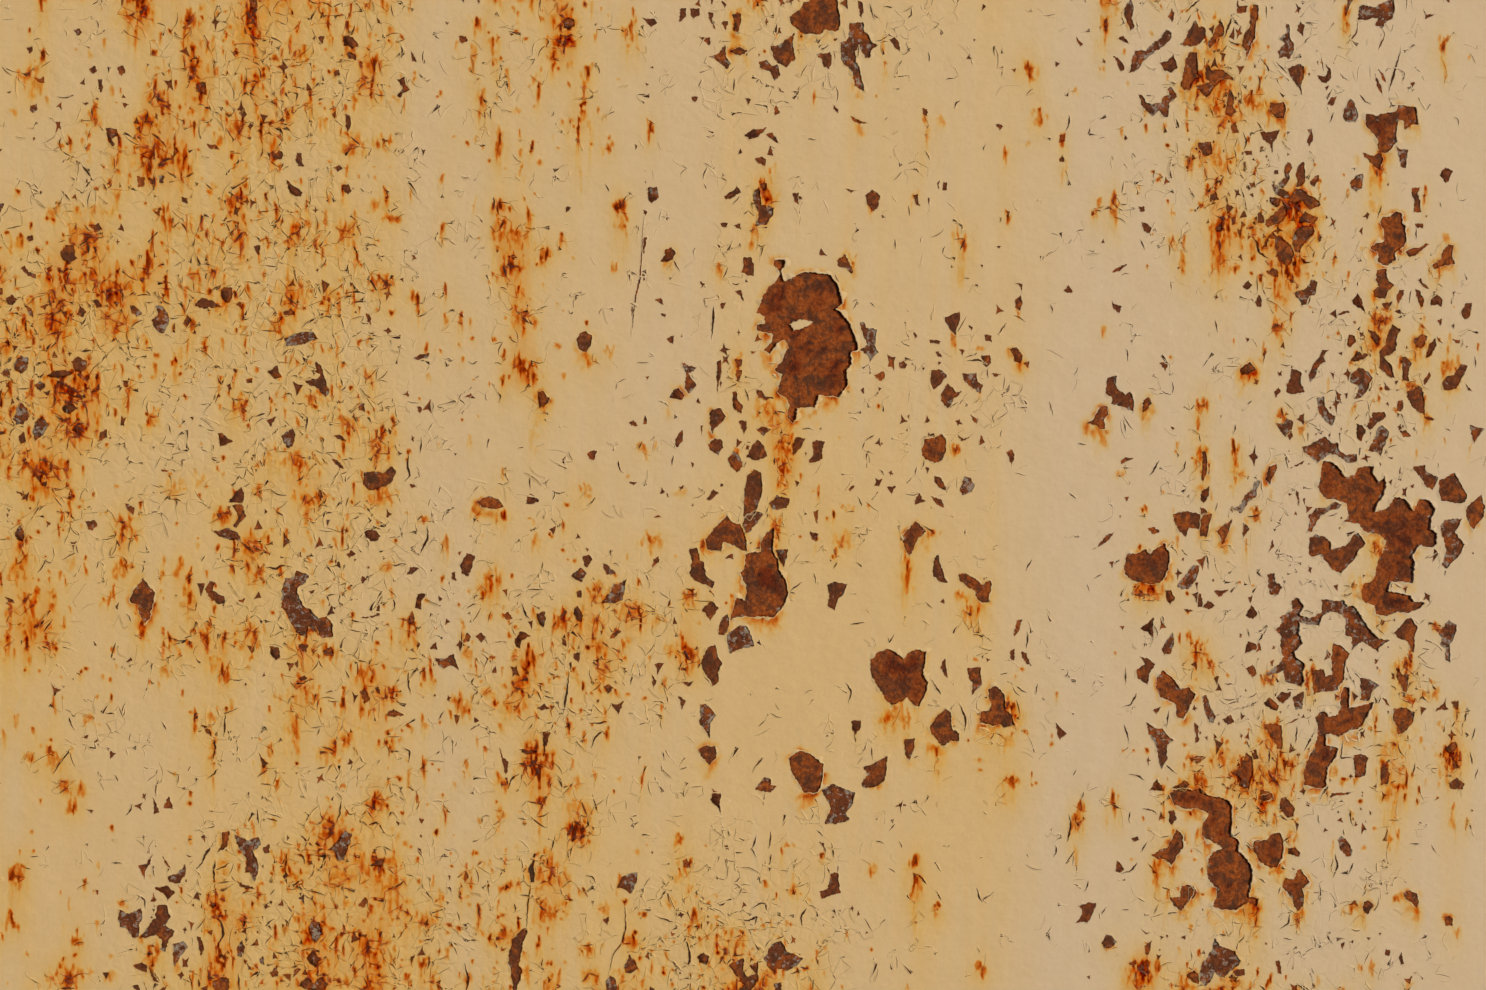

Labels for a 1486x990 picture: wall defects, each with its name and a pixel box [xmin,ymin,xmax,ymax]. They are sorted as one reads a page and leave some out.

peeling [679,0,901,94]
peeling [1113,0,1260,133]
rust [492,199,563,331]
rust [1199,161,1321,288]
peeling [1242,20,1421,308]
rust [472,337,539,400]
peeling [678,246,908,765]
peeling [1123,187,1486,915]
rust [140,585,256,679]
rust [502,606,617,731]
peeling [755,647,961,826]
rust [293,898,461,990]